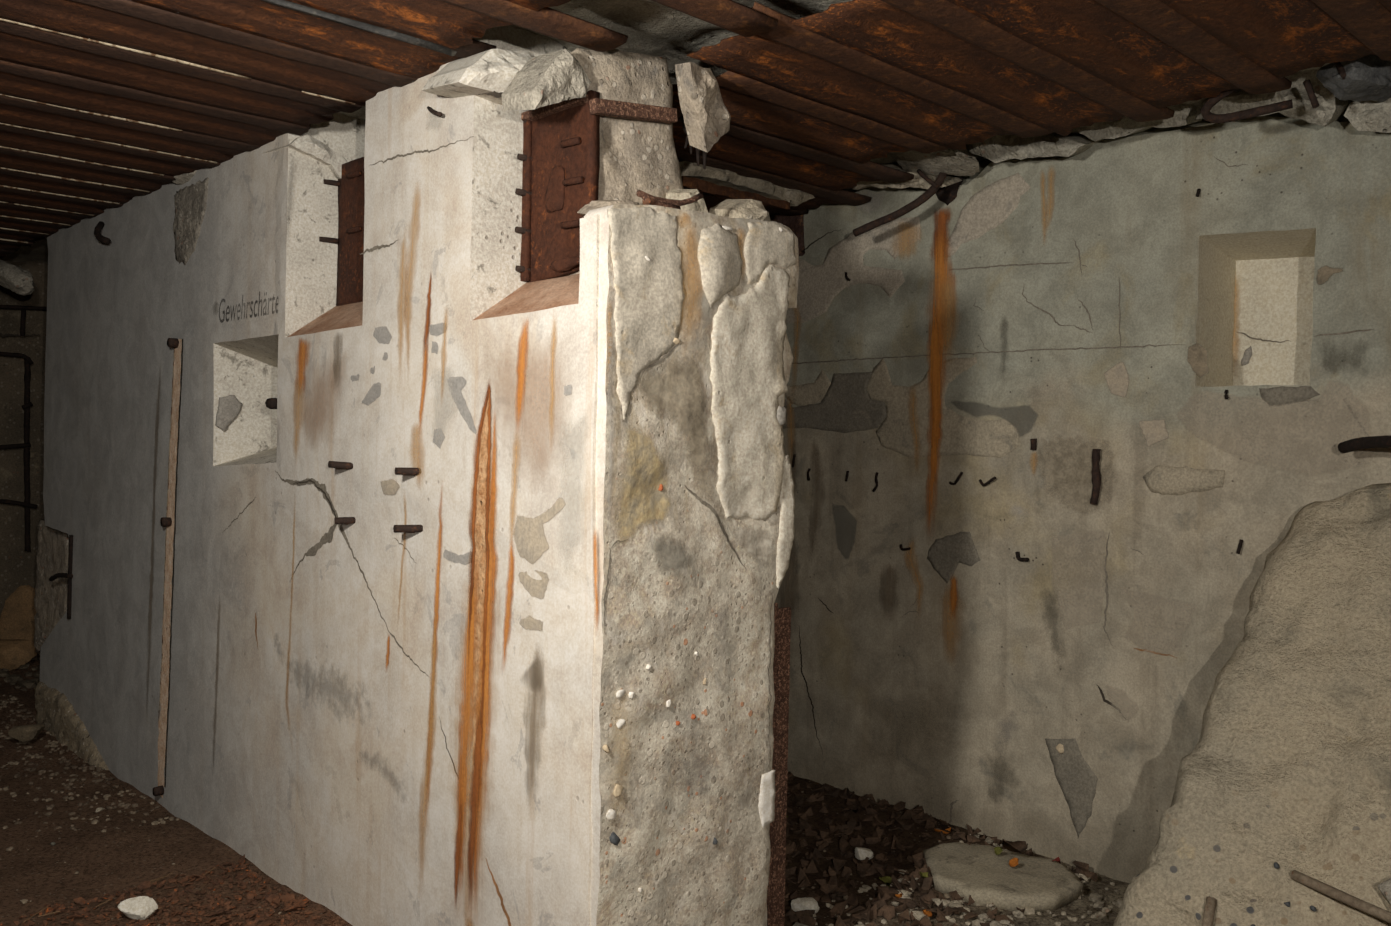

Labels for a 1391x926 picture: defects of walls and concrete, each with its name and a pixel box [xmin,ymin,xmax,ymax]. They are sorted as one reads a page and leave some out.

spalling [0,352,73,653]
crack [223,471,431,679]
rust [454,386,517,902]
rust [517,325,527,417]
flaking render [607,169,1030,589]
rust [927,210,953,521]
spalling [952,402,1113,511]